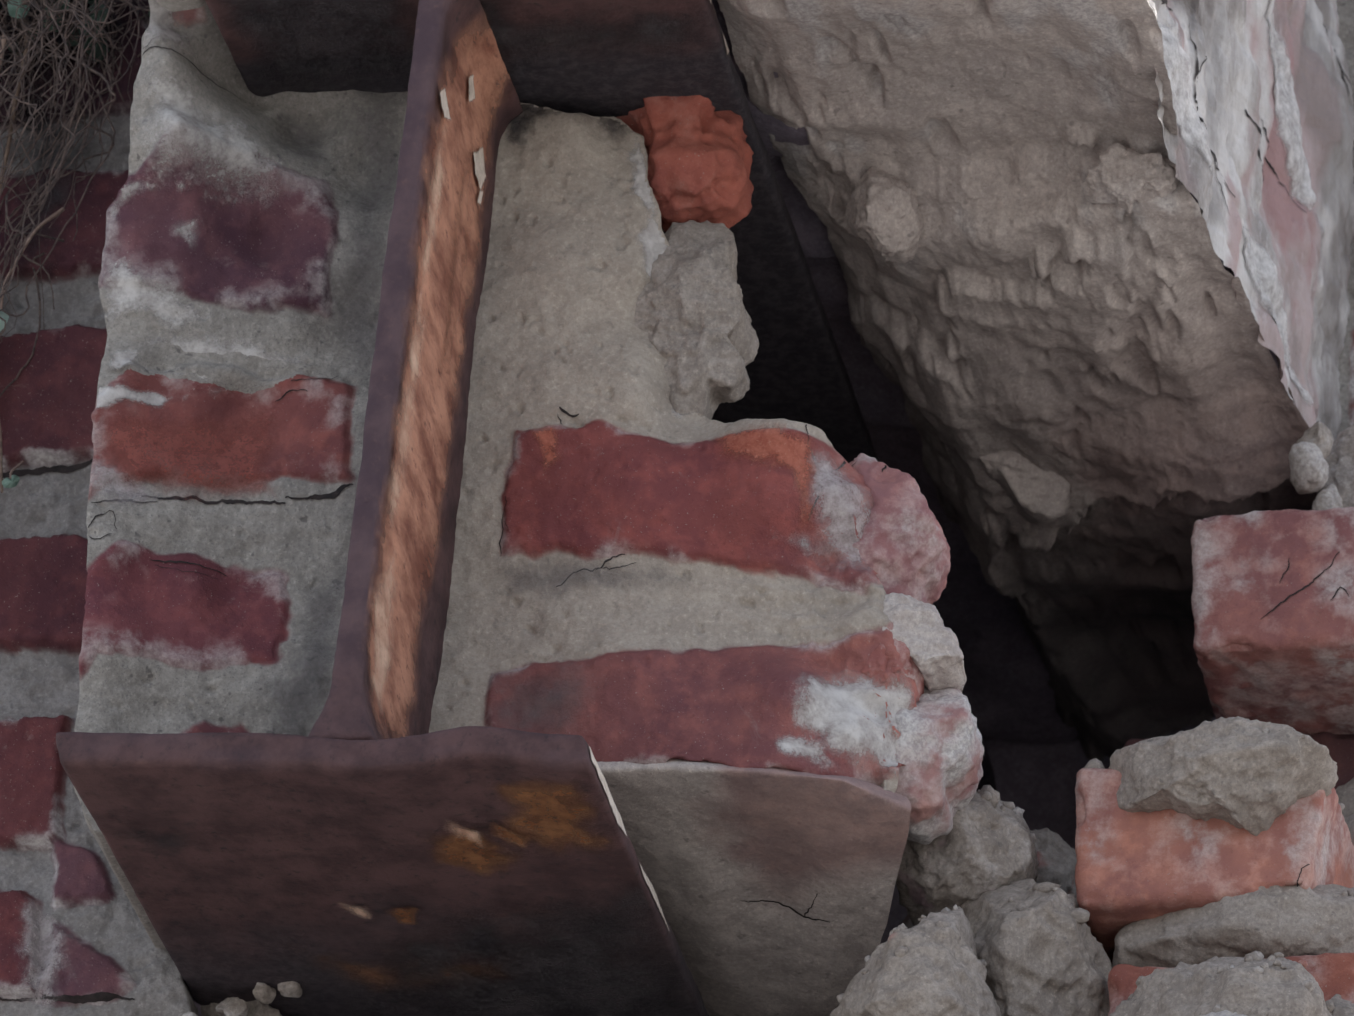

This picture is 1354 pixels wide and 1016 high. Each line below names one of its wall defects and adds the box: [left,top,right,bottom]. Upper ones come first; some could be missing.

spalling [616,95,754,233]
flaking render [1244,227,1313,403]
rust [369,27,507,737]
crack [3,459,93,478]
spalling [717,428,812,521]
crack [1261,551,1349,619]
rust [438,784,606,873]
peeling [589,746,627,836]
leakage [778,678,912,767]
spalling [1075,507,1354,1016]
peeling [640,865,669,929]
crack [0,992,135,1004]